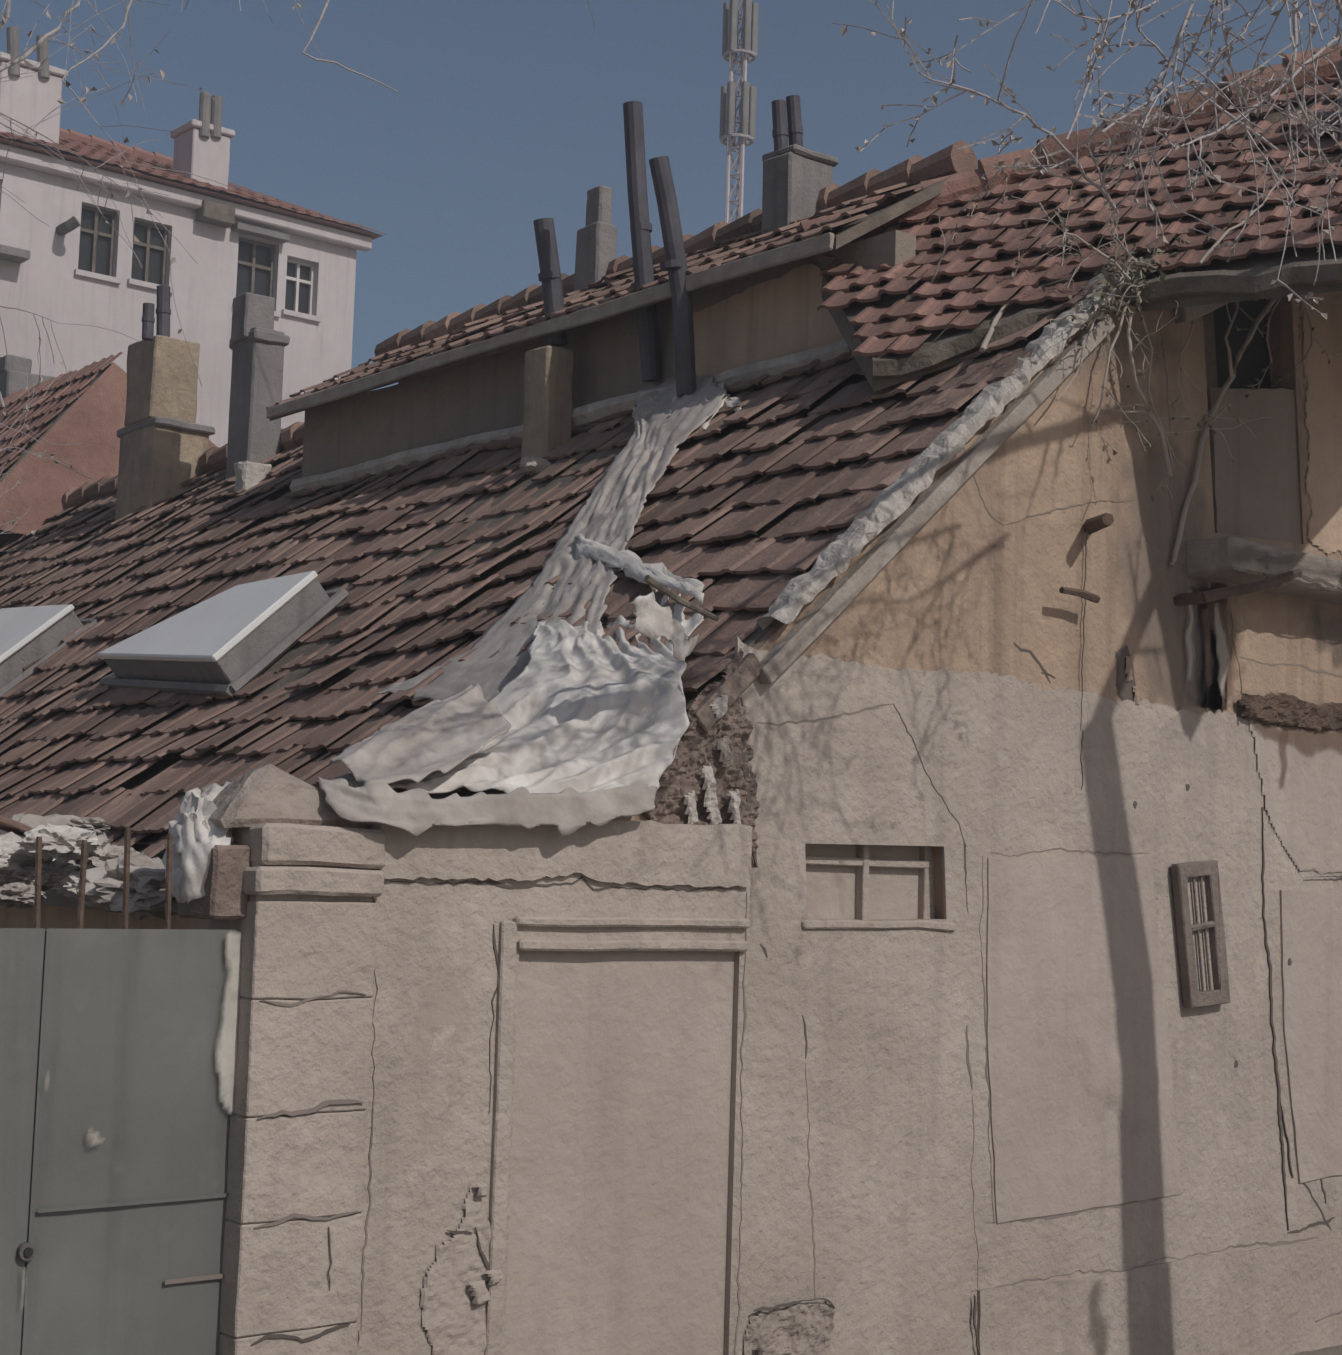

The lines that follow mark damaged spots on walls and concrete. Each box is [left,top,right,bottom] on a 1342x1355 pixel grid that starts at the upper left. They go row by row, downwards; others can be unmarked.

spalling [645,648,760,853]
crack [251,969,378,1347]
crack [374,852,836,1355]
crack [740,697,1335,1355]